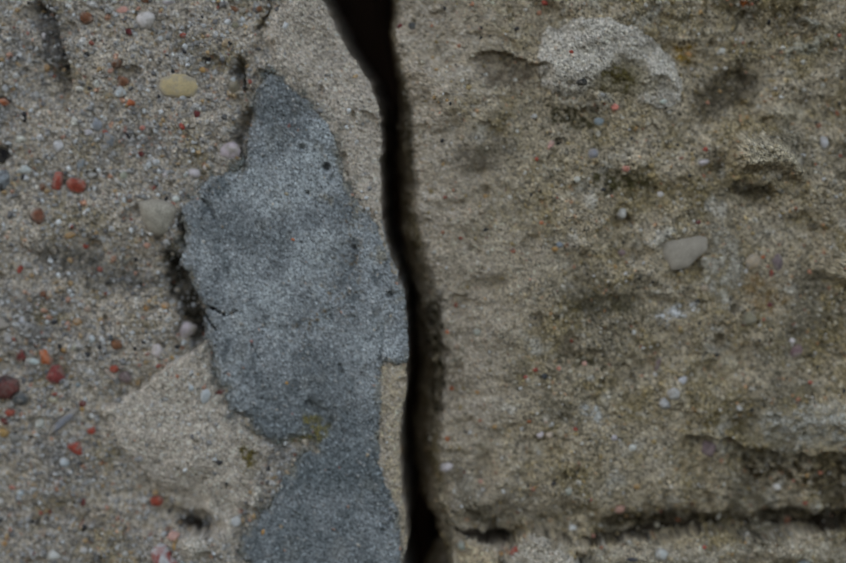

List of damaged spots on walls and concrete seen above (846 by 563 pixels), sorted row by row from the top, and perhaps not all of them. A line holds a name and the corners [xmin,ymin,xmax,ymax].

crack [333,0,406,260]
crack [407,283,514,563]
crack [177,515,210,530]
crack [588,519,710,546]
crack [761,510,846,532]